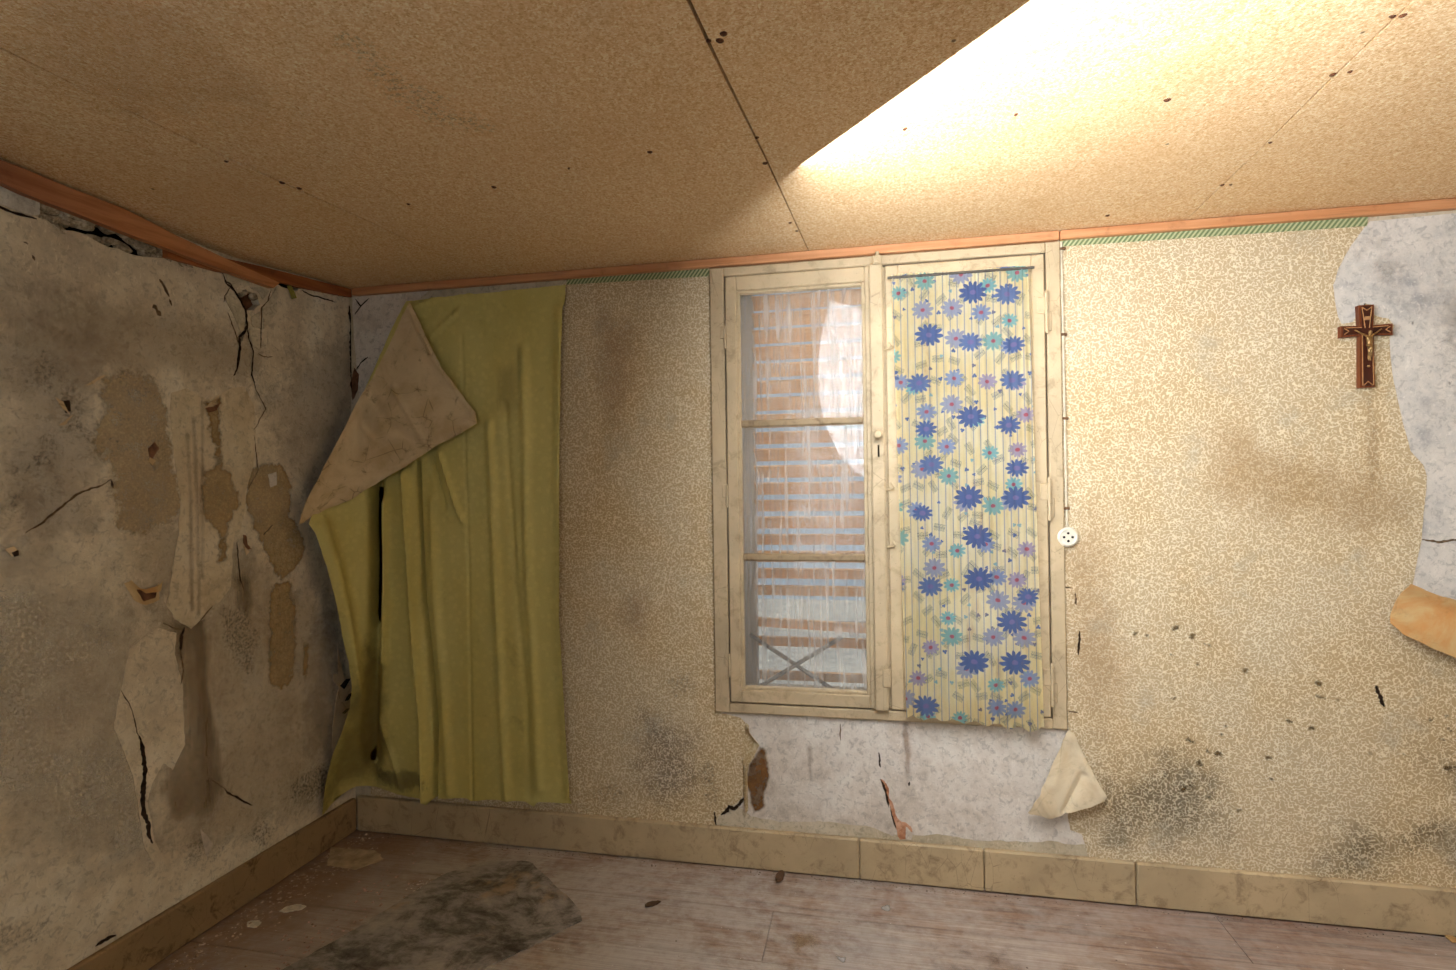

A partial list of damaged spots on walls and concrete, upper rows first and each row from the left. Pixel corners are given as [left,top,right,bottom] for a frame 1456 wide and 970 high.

flaking render [225,273,289,350]
crack [222,273,368,491]
peeling [352,291,428,400]
peeling [1333,213,1456,600]
flaking render [114,387,277,867]
crack [163,525,273,683]
crack [1422,537,1456,545]
crack [121,691,153,843]
peeling [720,712,1085,845]